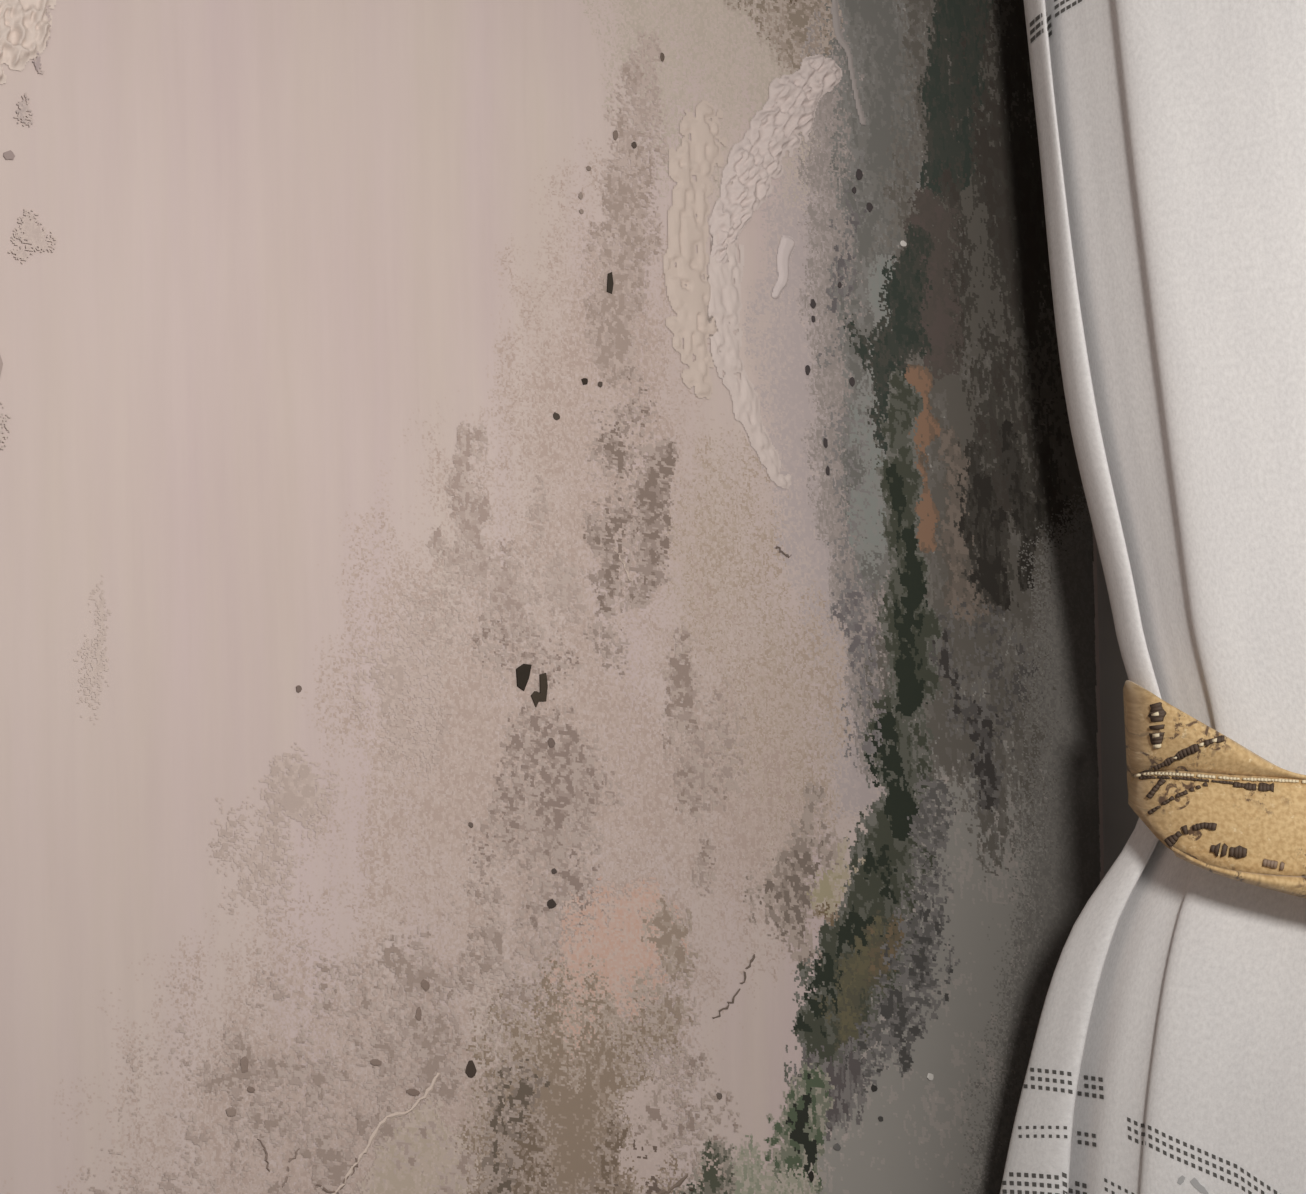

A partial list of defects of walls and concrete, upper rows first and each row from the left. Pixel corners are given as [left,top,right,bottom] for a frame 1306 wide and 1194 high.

leakage [8,208,57,264]
leakage [87,0,1101,1194]
crack [657,1174,694,1194]